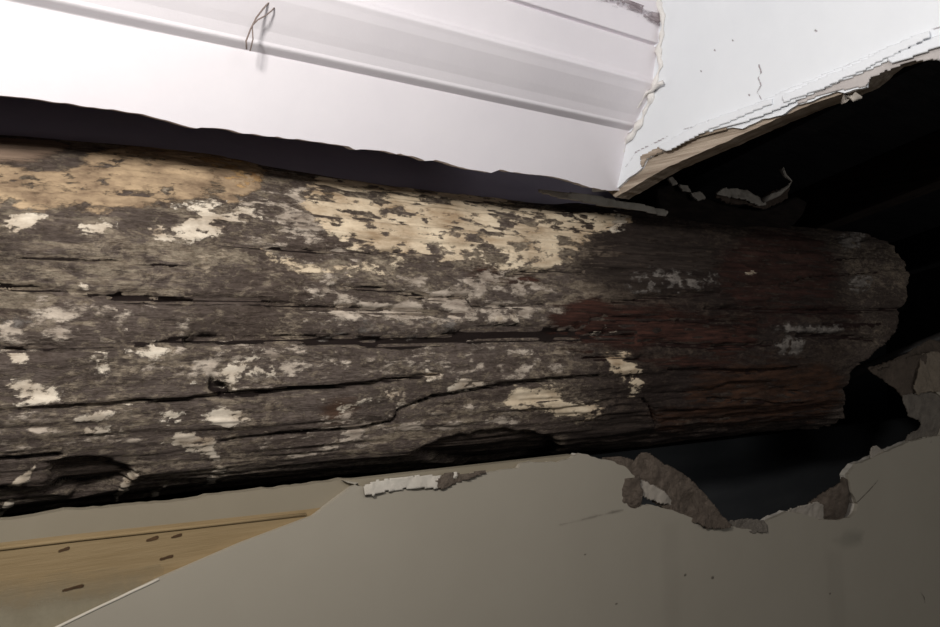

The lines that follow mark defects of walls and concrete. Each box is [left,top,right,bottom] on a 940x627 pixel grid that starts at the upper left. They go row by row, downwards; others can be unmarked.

peeling [640,31,940,167]
peeling [0,145,633,343]
crack [506,269,581,277]
peeling [1,379,64,452]
peeling [0,296,129,364]
peeling [159,410,228,486]
peeling [92,315,351,391]
peeling [201,406,251,428]
spalling [261,340,602,496]
crack [0,282,899,436]
flaking render [868,339,940,443]
flaking render [602,452,768,534]